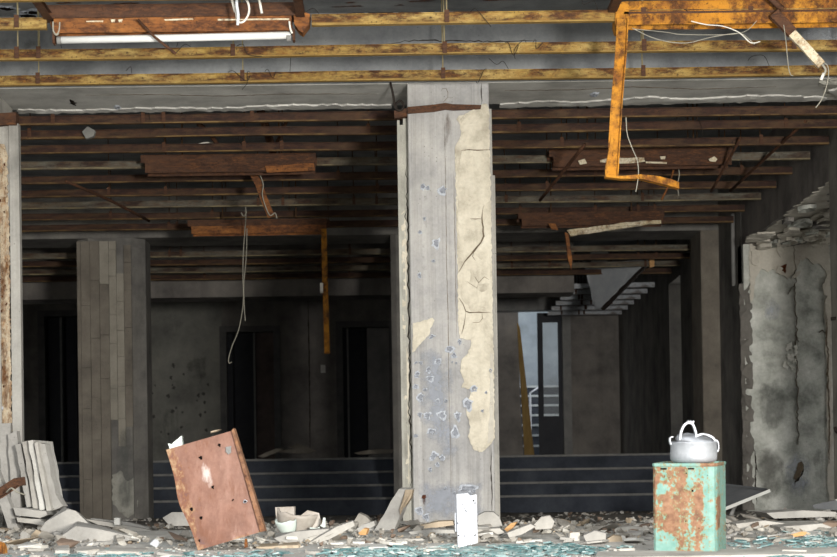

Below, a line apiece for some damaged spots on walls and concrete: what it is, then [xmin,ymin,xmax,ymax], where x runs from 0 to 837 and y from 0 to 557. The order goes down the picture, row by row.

spalling [499,92,611,109]
spalling [623,78,837,105]
rust [0,144,13,431]
peeling [412,104,495,452]
crack [446,206,489,385]
peeling [737,182,835,501]
crack [789,255,800,438]
crack [819,319,831,463]
spalling [400,490,429,522]
spalling [444,484,479,495]